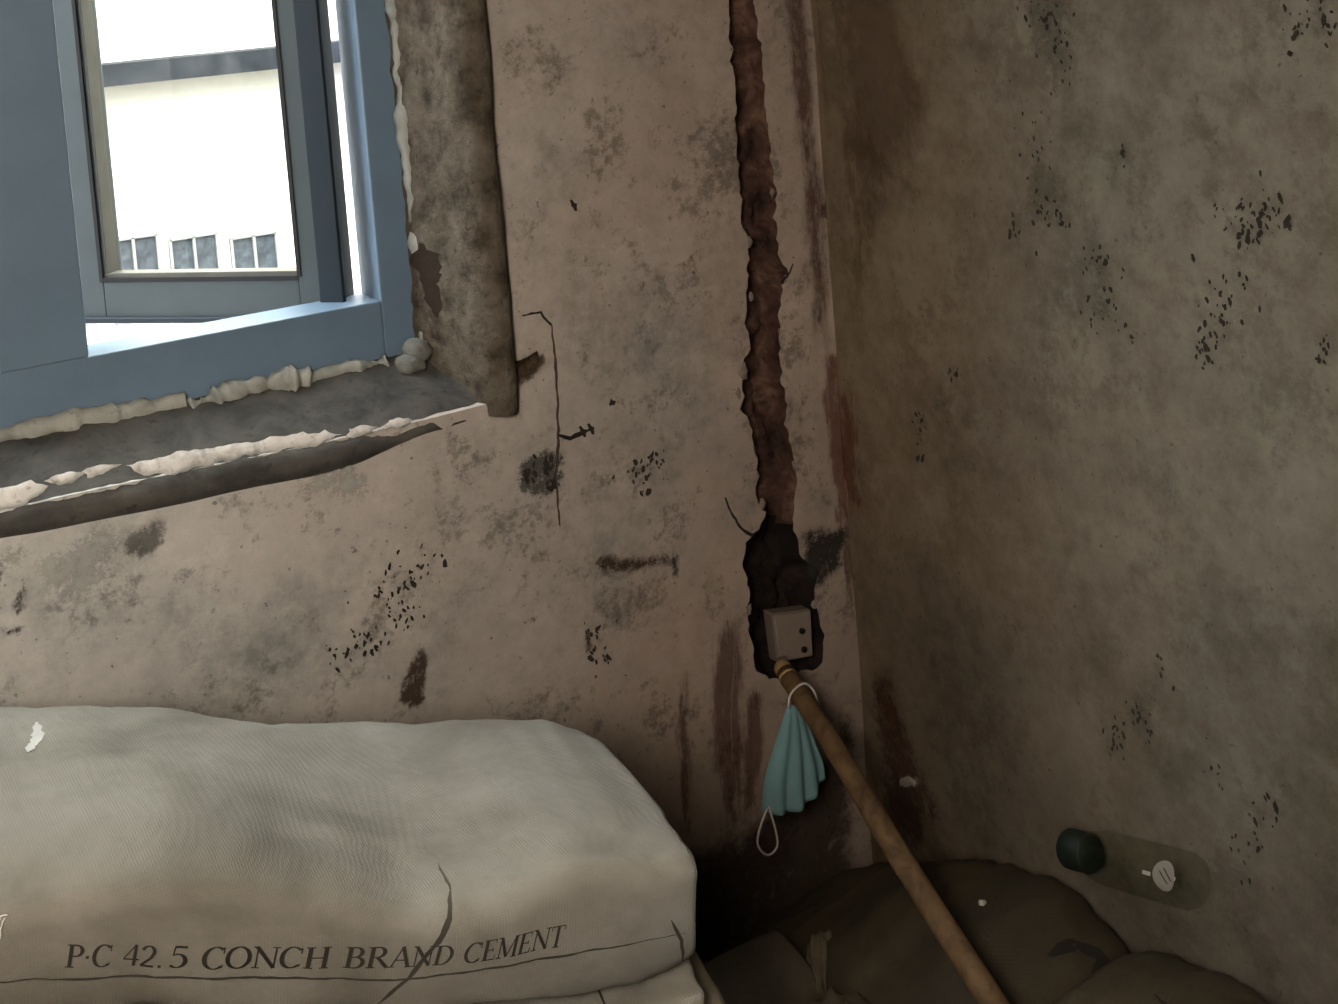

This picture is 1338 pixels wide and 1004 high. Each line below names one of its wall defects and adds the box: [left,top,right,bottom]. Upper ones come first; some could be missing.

leakage [1213,170,1292,250]
leakage [1194,271,1248,370]
crack [522,311,591,526]
leakage [325,544,447,673]
leakage [399,651,428,708]